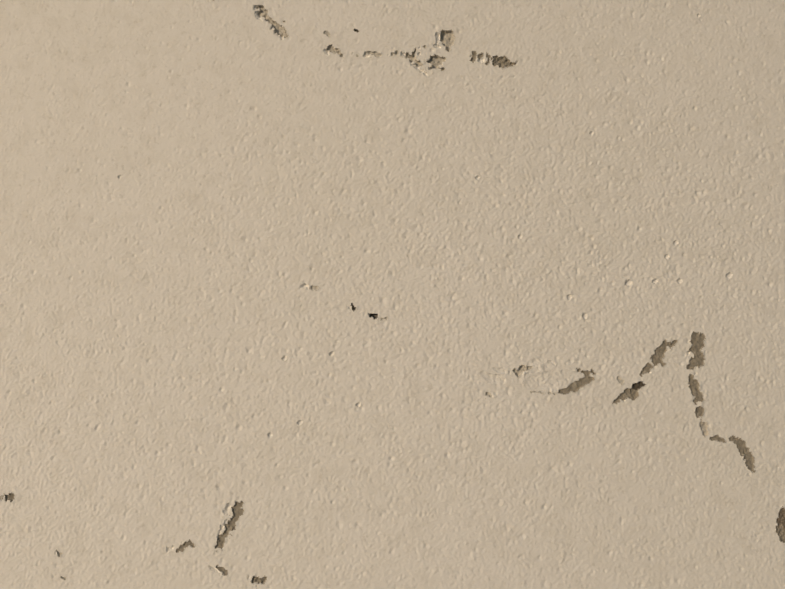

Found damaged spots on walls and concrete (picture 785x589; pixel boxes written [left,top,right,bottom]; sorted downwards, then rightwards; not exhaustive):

crack [322,29,519,77]
crack [612,331,756,474]
crack [165,539,279,589]